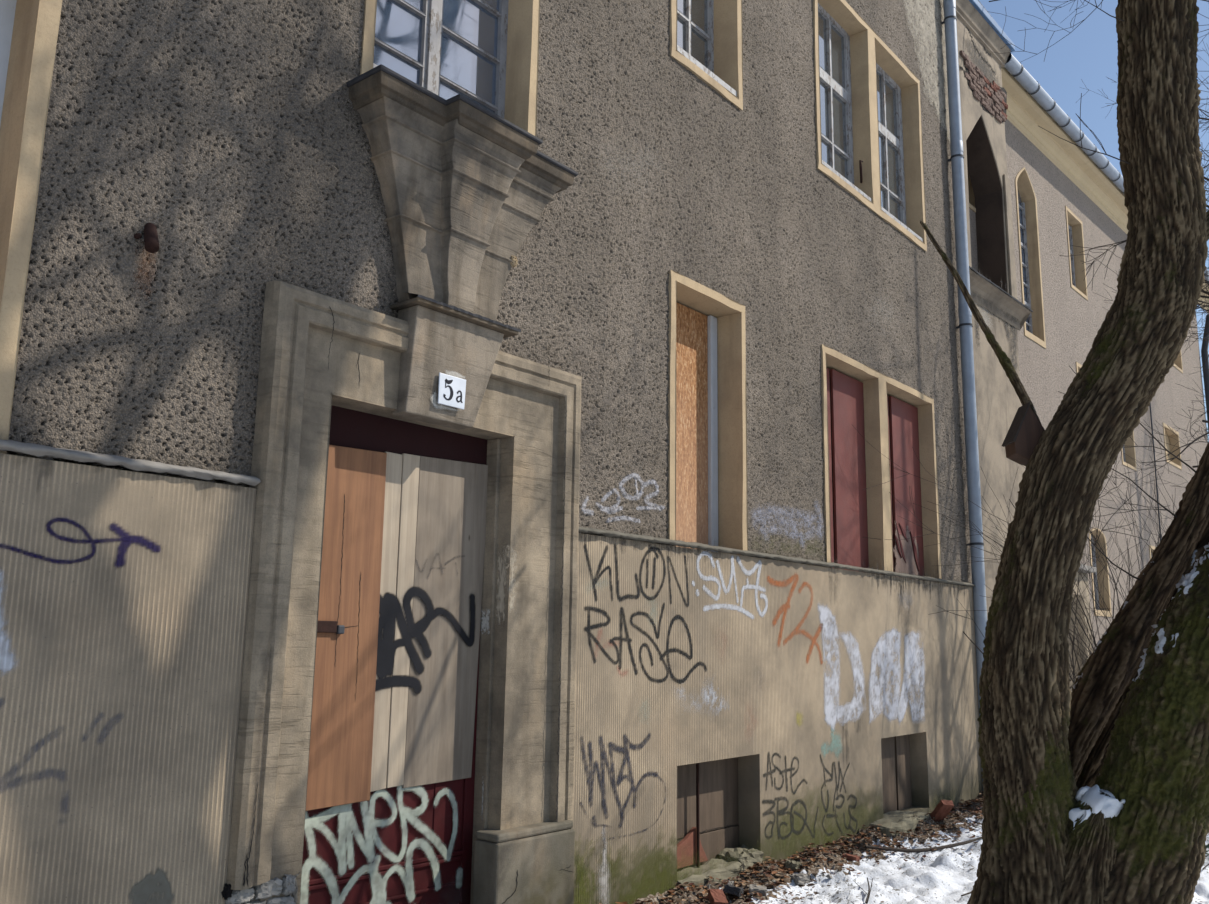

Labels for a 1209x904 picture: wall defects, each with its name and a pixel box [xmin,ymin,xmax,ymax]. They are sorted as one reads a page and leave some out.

peeling [904,0,1008,141]
damp [129,869,173,904]
damp [574,832,687,904]